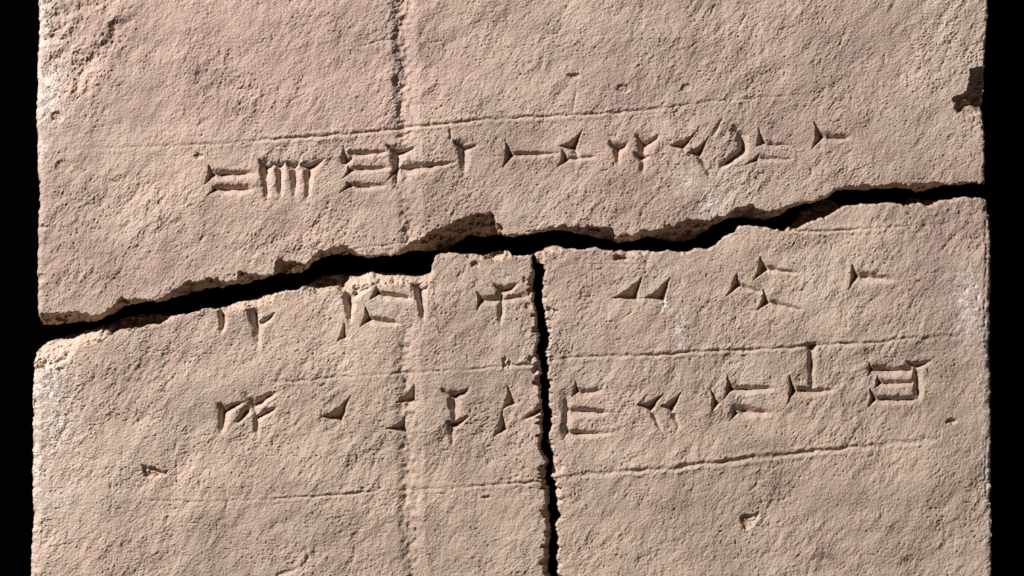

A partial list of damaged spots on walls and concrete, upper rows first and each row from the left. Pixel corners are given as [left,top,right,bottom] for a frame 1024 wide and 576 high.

crack [54,186,968,576]